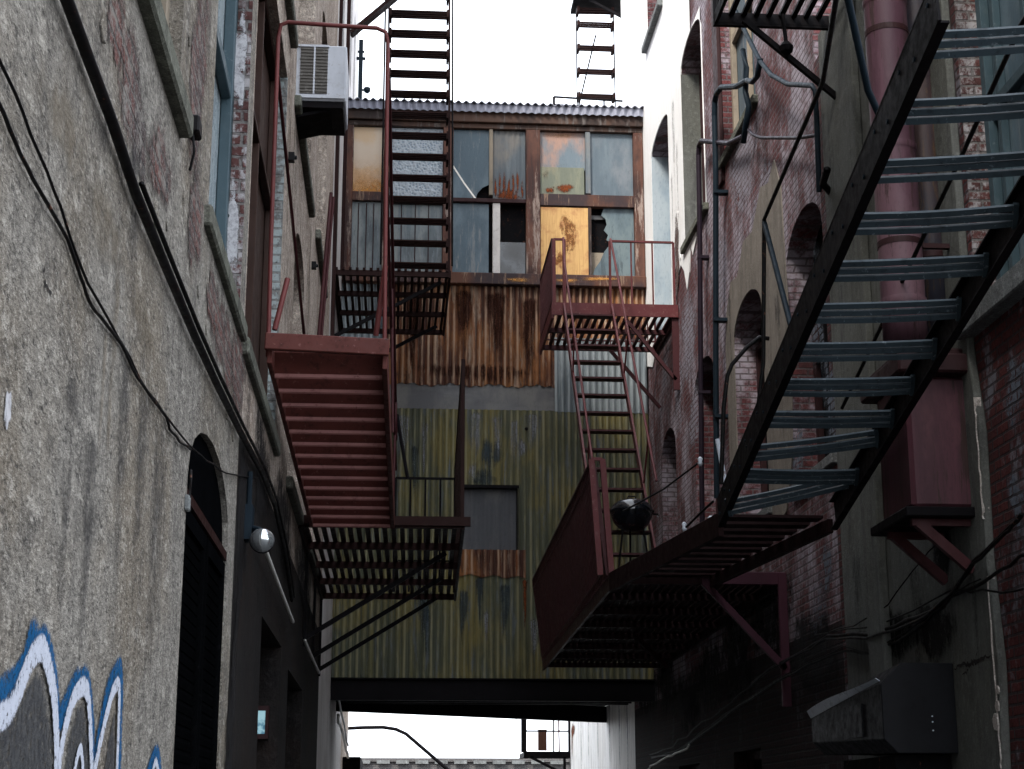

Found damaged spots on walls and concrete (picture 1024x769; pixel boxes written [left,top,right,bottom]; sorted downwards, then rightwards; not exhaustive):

peeling [234,13,248,109]
corrosion [494,172,523,199]
corrosion [556,216,575,265]
corrosion [430,290,535,382]